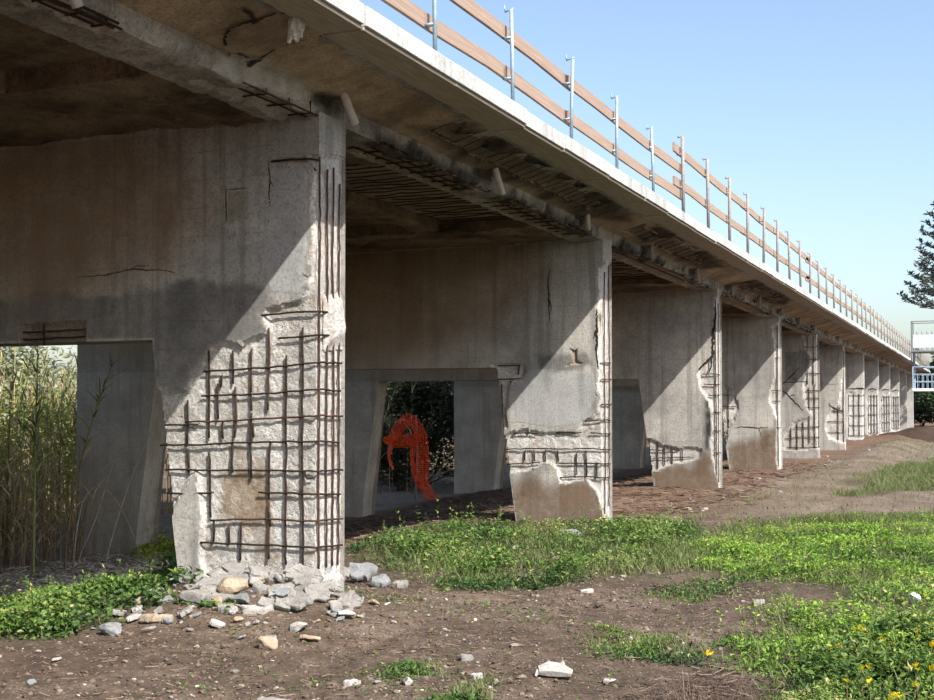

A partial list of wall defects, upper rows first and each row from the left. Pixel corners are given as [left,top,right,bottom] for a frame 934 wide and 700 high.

spalling [19,0,124,37]
crack [223,10,322,67]
crack [76,265,175,278]
crack [545,270,553,322]
spalling [159,143,586,581]
spalling [490,248,704,520]
crack [698,307,717,373]
spalling [648,293,900,488]
crack [783,367,807,411]